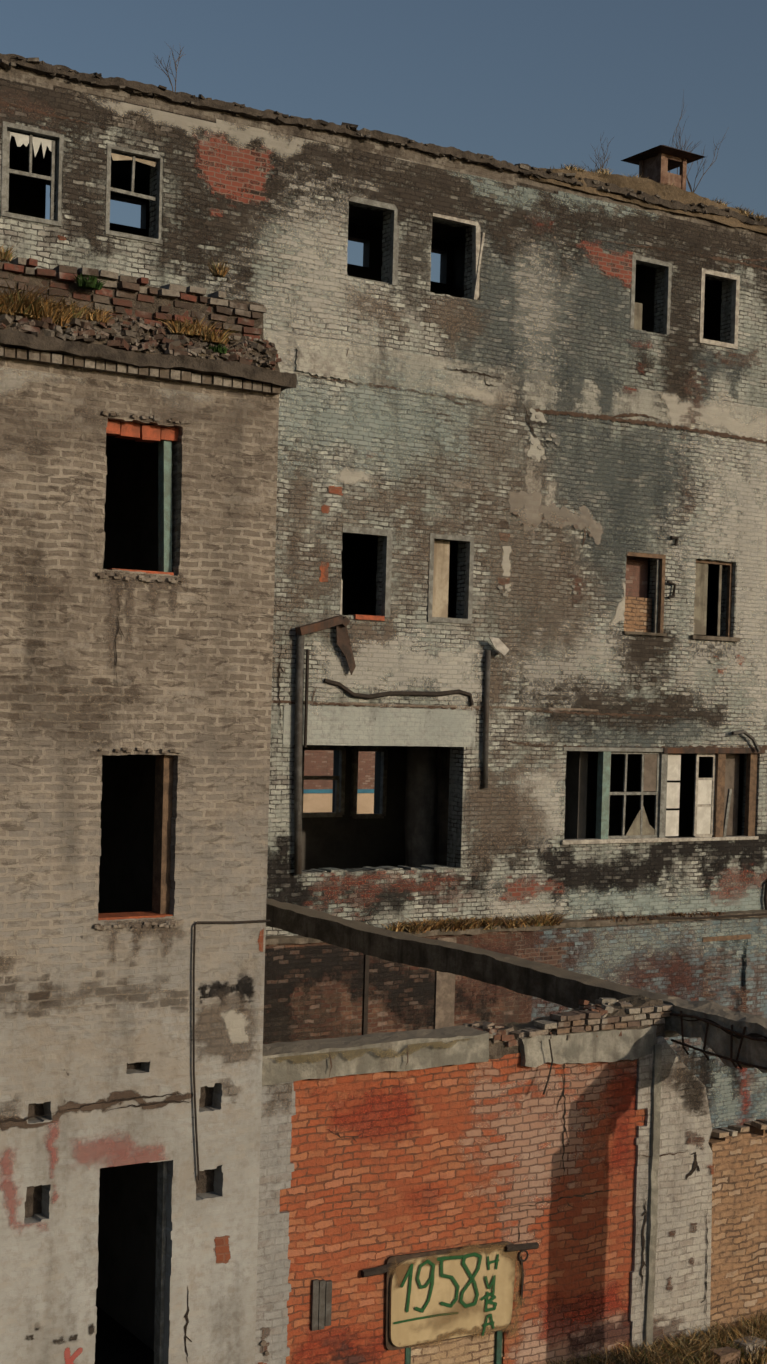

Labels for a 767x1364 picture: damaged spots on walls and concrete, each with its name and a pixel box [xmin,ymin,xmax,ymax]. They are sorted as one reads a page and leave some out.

spalling [193,131,274,217]
damp [345,287,404,338]
damp [596,368,620,433]
damp [674,349,750,403]
flaking render [527,407,560,463]
flaking render [502,490,604,545]
damp [699,859,719,898]
damp [671,1051,706,1116]
crack [497,1063,647,1289]
crack [633,1150,700,1180]
crack [700,1214,708,1331]
crack [184,1286,192,1362]